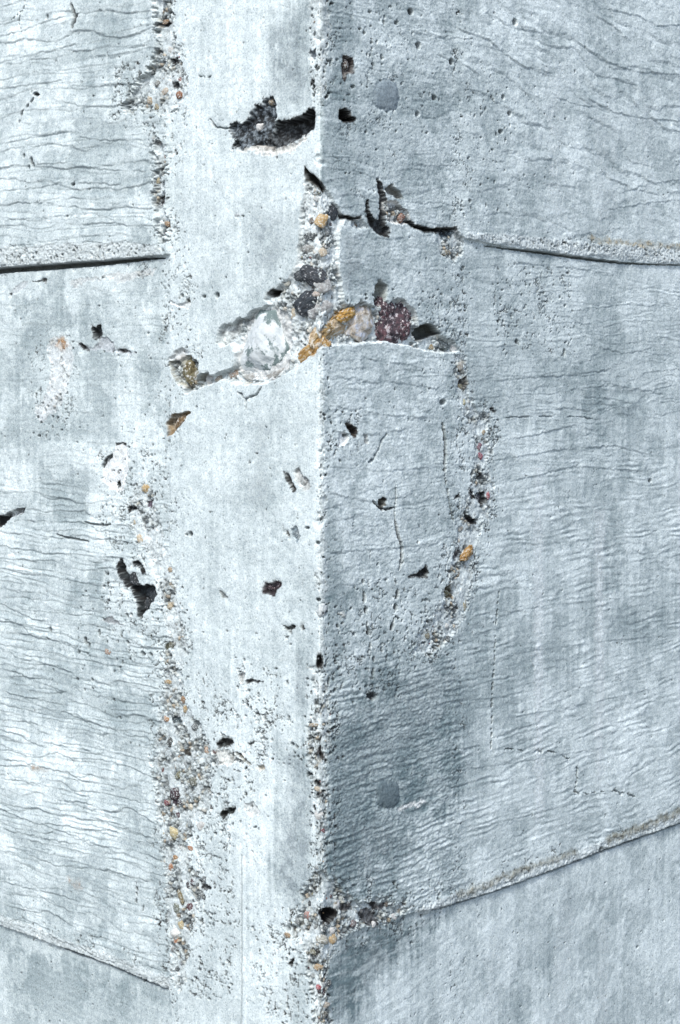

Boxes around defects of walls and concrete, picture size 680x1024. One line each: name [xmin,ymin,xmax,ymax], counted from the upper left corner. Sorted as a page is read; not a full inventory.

spalling [229,95,316,157]
spalling [167,167,465,395]